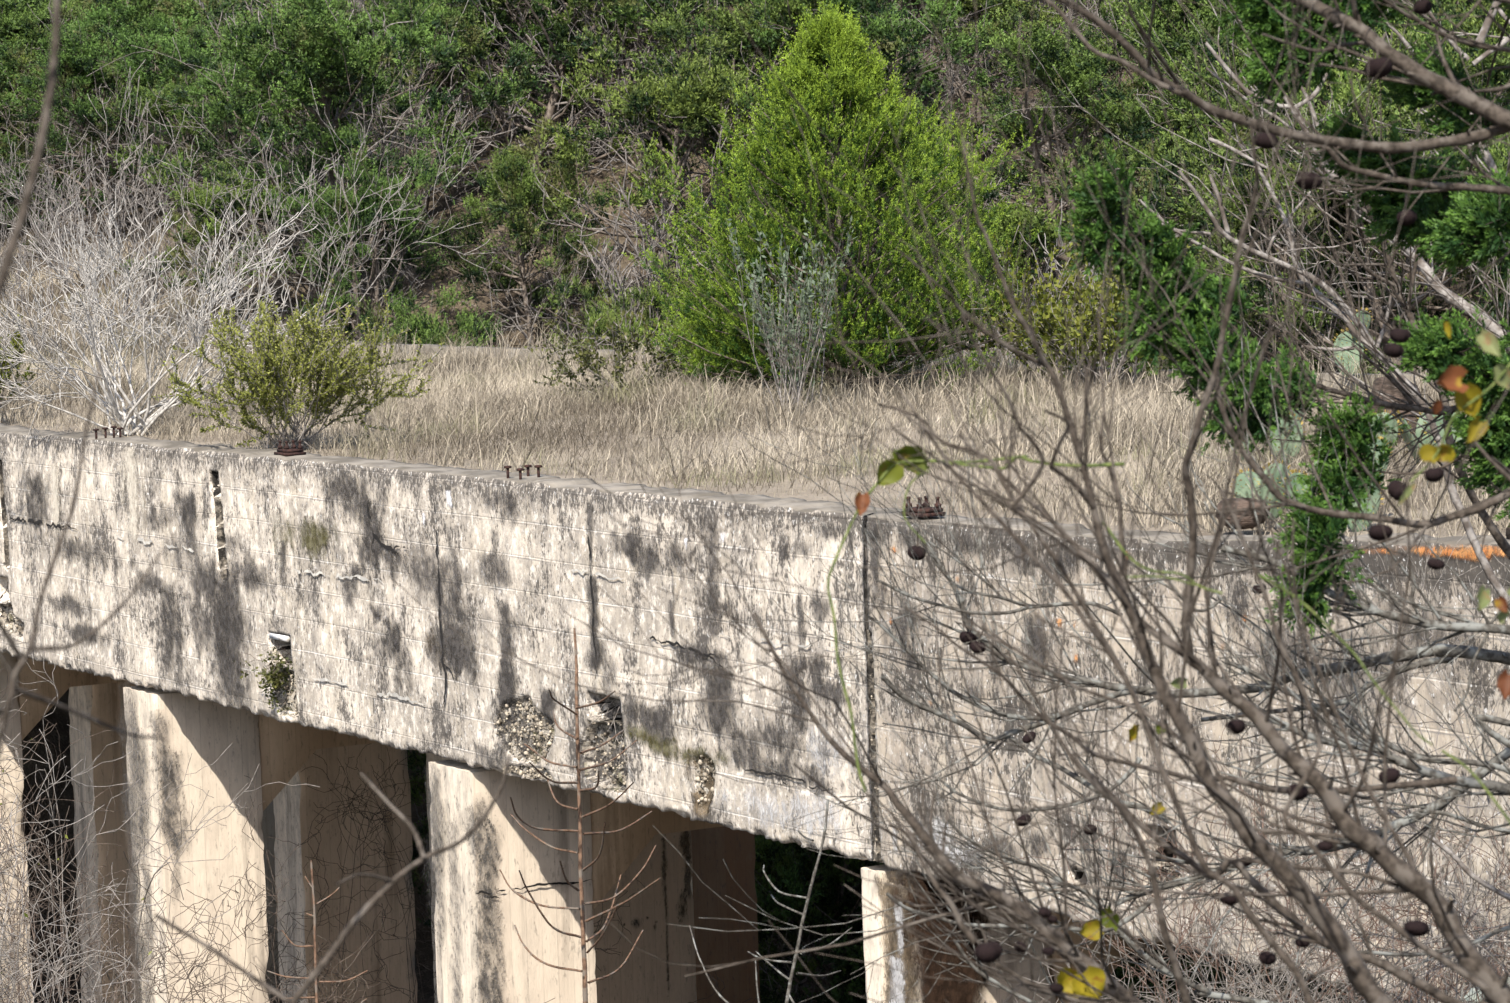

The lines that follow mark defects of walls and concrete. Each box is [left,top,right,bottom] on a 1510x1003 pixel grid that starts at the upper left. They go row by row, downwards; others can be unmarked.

water stain [118,686,187,1003]
water stain [20,447,286,706]
spalling [269,633,299,717]
water stain [323,470,555,769]
water stain [424,767,503,1003]
spalling [494,696,555,780]
water stain [586,505,616,689]
water stain [580,697,675,792]
water stain [611,513,851,836]